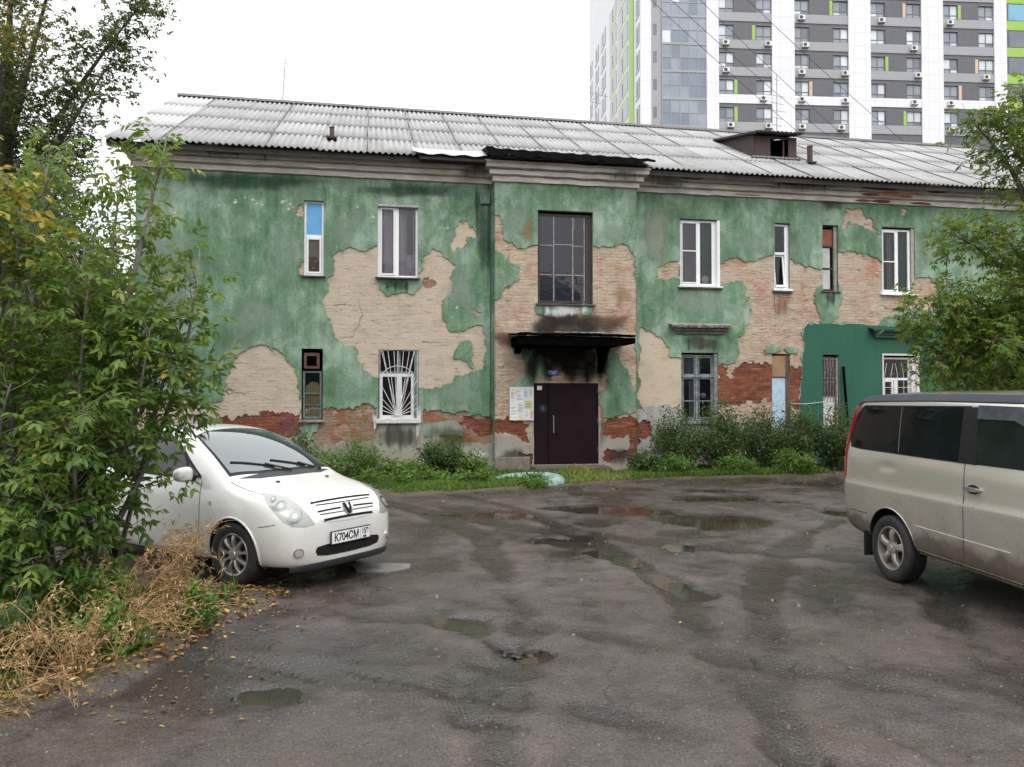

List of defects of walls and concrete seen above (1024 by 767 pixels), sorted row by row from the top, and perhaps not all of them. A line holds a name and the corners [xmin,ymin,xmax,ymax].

flaking render [841,187,947,234]
flaking render [137,215,683,466]
damp [536,305,625,331]
flaking render [718,250,940,423]
damp [527,348,607,382]